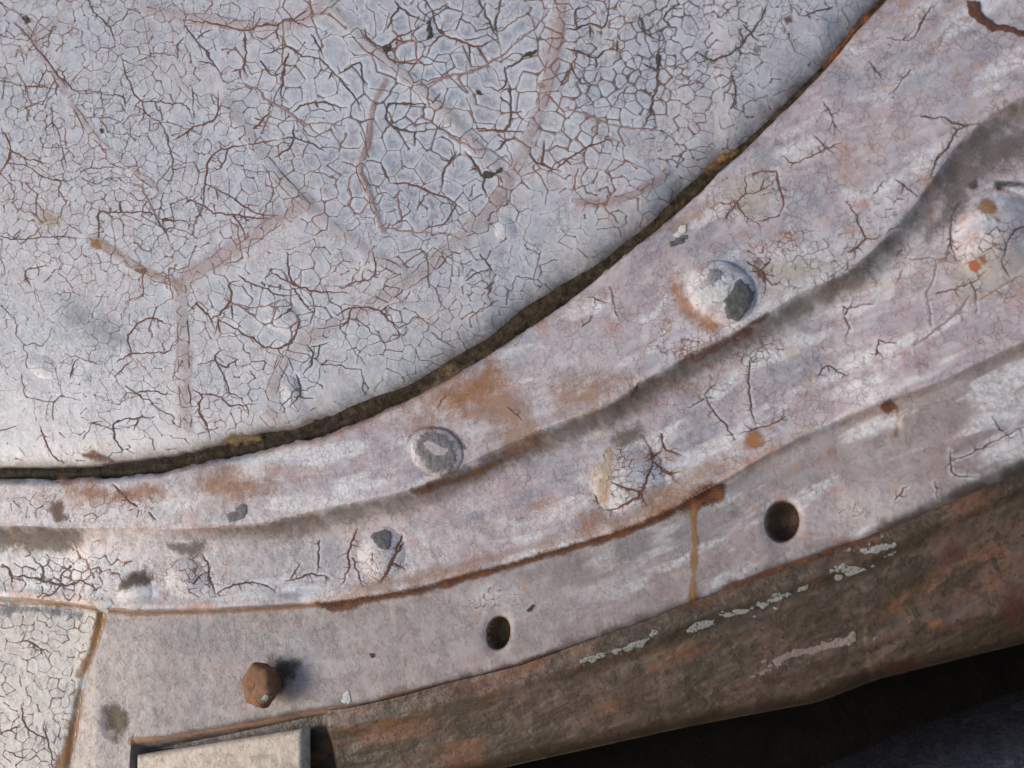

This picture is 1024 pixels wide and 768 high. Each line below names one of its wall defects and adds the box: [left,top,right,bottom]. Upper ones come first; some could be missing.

crack [0,0,1024,464]
corrosion [979,200,998,221]
corrosion [969,255,986,272]
peeling [694,269,755,321]
corrosion [880,399,897,413]
peeling [371,529,392,550]
peeling [830,536,897,581]
crack [0,483,156,768]
corrosion [128,465,1024,768]
peeling [686,585,808,633]
peeling [750,631,856,678]
corrosion [55,690,82,768]